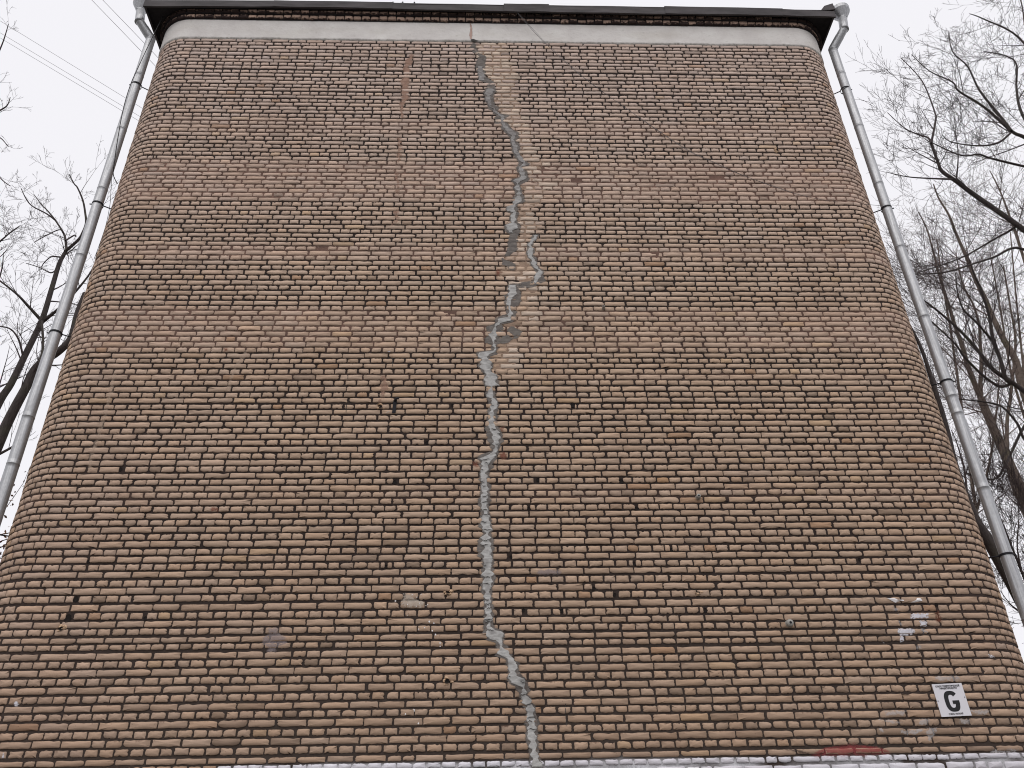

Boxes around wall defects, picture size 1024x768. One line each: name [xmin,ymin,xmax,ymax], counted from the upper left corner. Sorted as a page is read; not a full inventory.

crack [469,23,545,768]